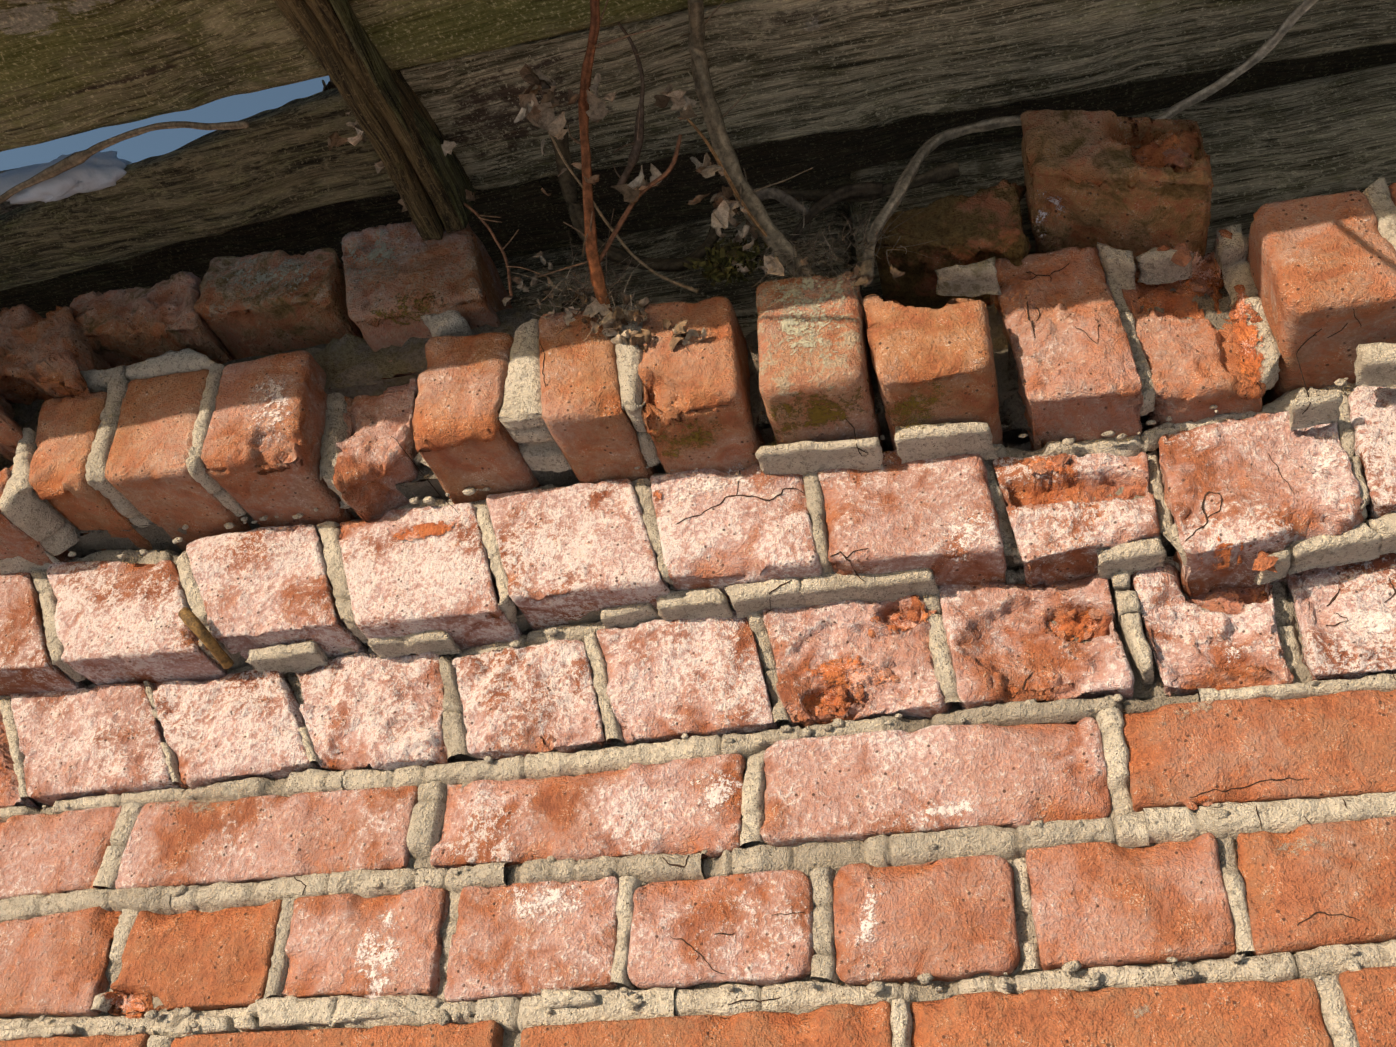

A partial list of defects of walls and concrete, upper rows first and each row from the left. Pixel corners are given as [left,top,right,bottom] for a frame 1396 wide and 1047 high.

spalling [1157,229,1266,398]
spalling [1018,453,1079,487]
crack [677,470,804,524]
leakage [930,510,1006,561]
crack [1186,491,1223,541]
spalling [1043,603,1109,643]
spalling [790,655,901,721]
efflorescence [687,769,741,814]
crack [1189,777,1305,829]
efflorescence [512,884,594,928]
efflorescence [854,879,884,958]
efflorescence [354,909,404,1002]